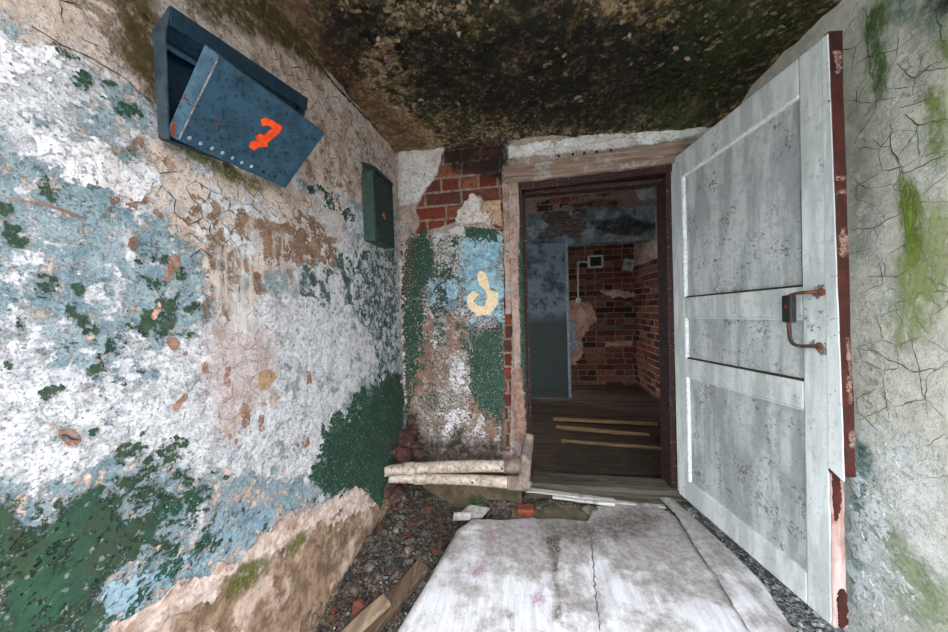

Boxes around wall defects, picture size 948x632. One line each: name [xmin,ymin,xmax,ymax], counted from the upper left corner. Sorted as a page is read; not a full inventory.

peeling [0,36,144,119]
peeling [341,29,426,111]
damp [191,0,817,150]
crack [157,154,312,428]
spalling [0,106,707,632]
crack [843,1,948,446]